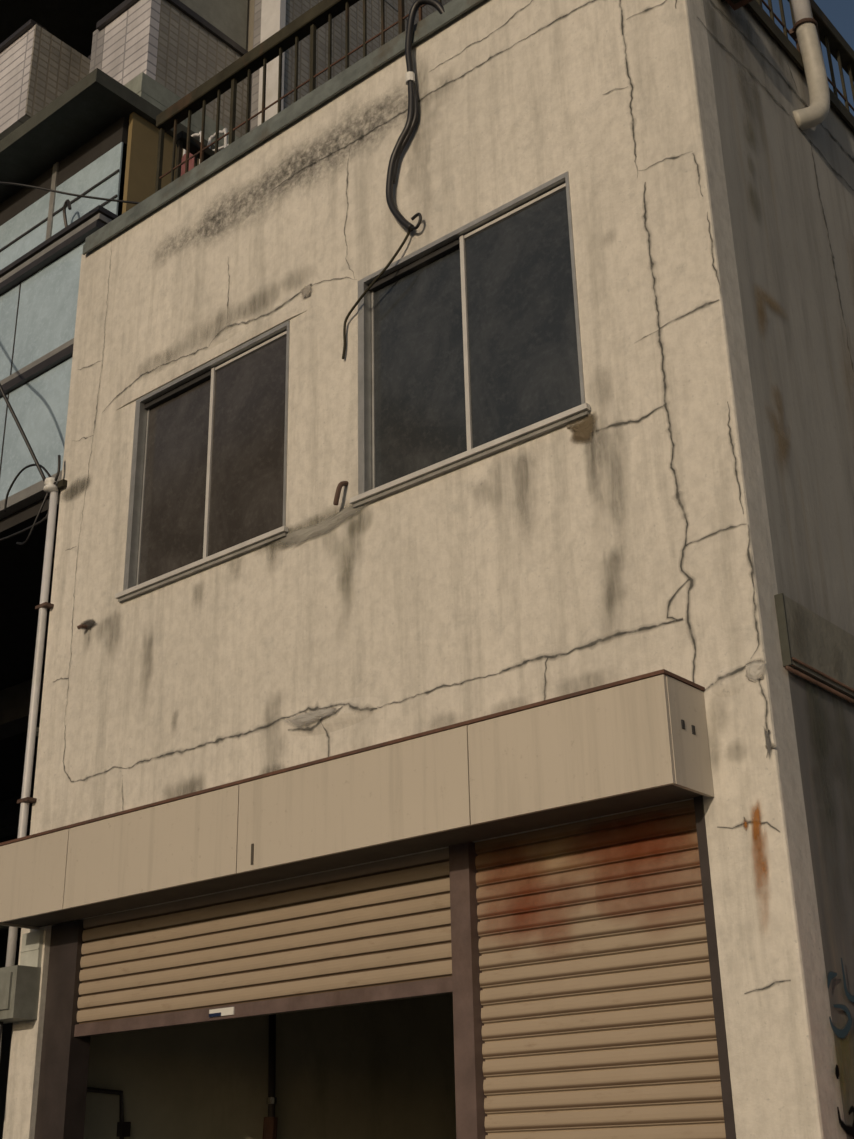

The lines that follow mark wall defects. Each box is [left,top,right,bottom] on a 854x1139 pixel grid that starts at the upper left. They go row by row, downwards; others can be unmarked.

crack [57,0,854,799]
rust [744,806,767,875]
crack [744,980,791,994]